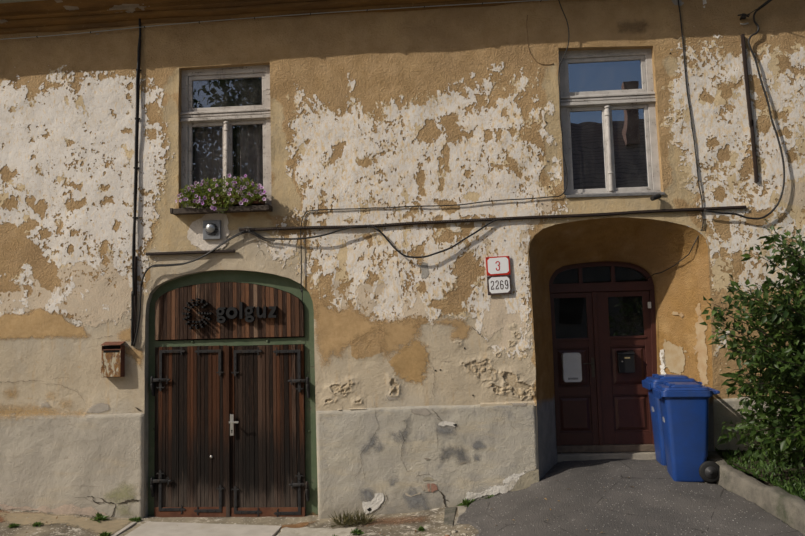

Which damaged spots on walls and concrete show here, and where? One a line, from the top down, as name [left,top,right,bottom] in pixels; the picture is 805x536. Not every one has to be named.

peeling [0,65,175,329]
peeling [257,61,572,410]
peeling [660,26,805,300]
crack [75,485,141,517]
spalling [362,493,384,514]
spalling [464,469,539,500]